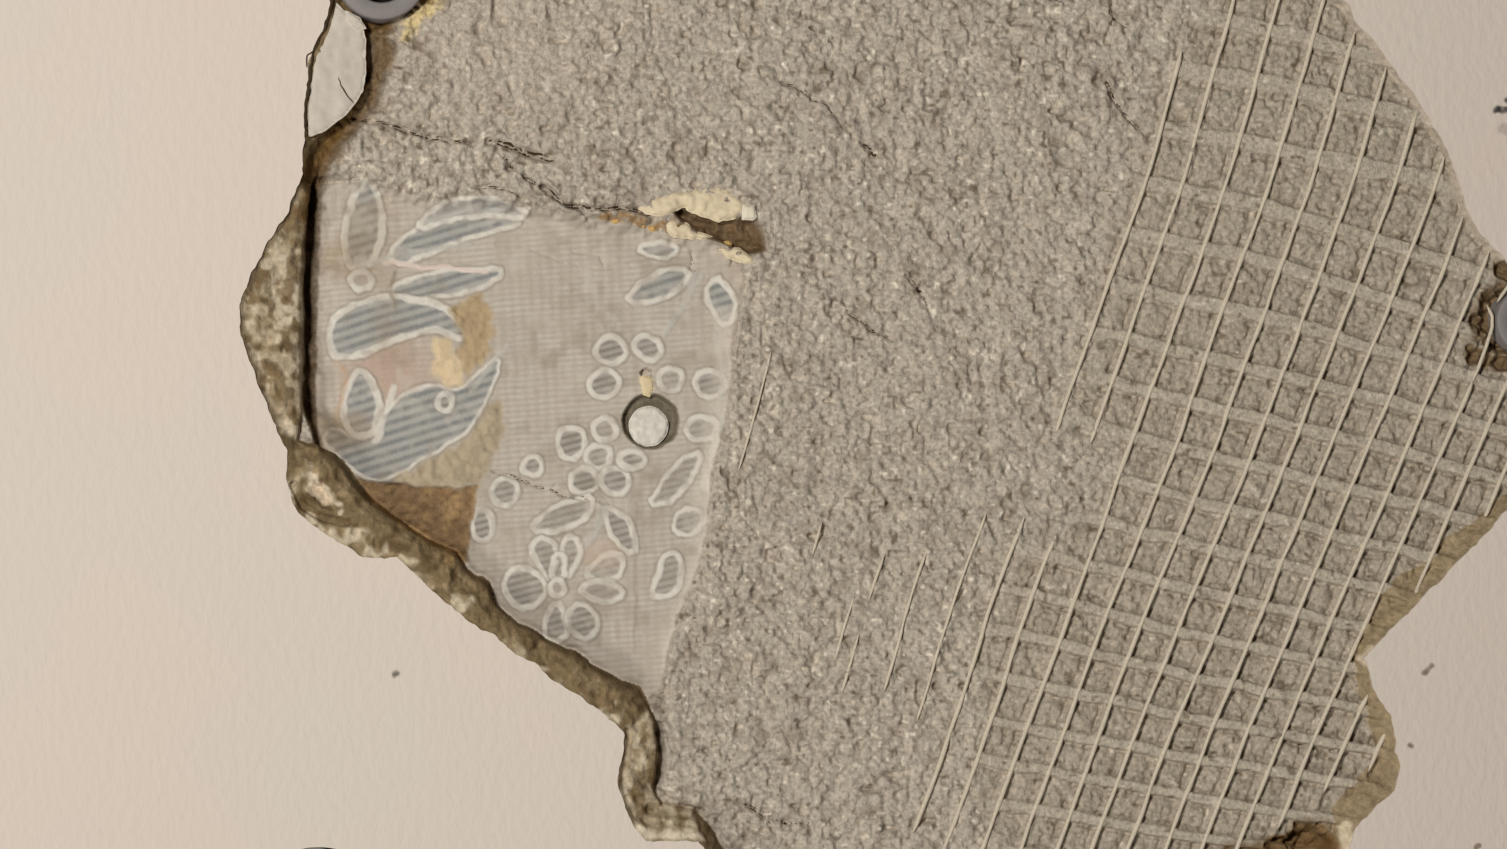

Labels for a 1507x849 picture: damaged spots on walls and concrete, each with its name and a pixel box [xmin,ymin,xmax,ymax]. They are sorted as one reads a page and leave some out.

crack [361,119,638,212]
flaking render [239,0,1276,849]
flaking render [980,0,1507,849]